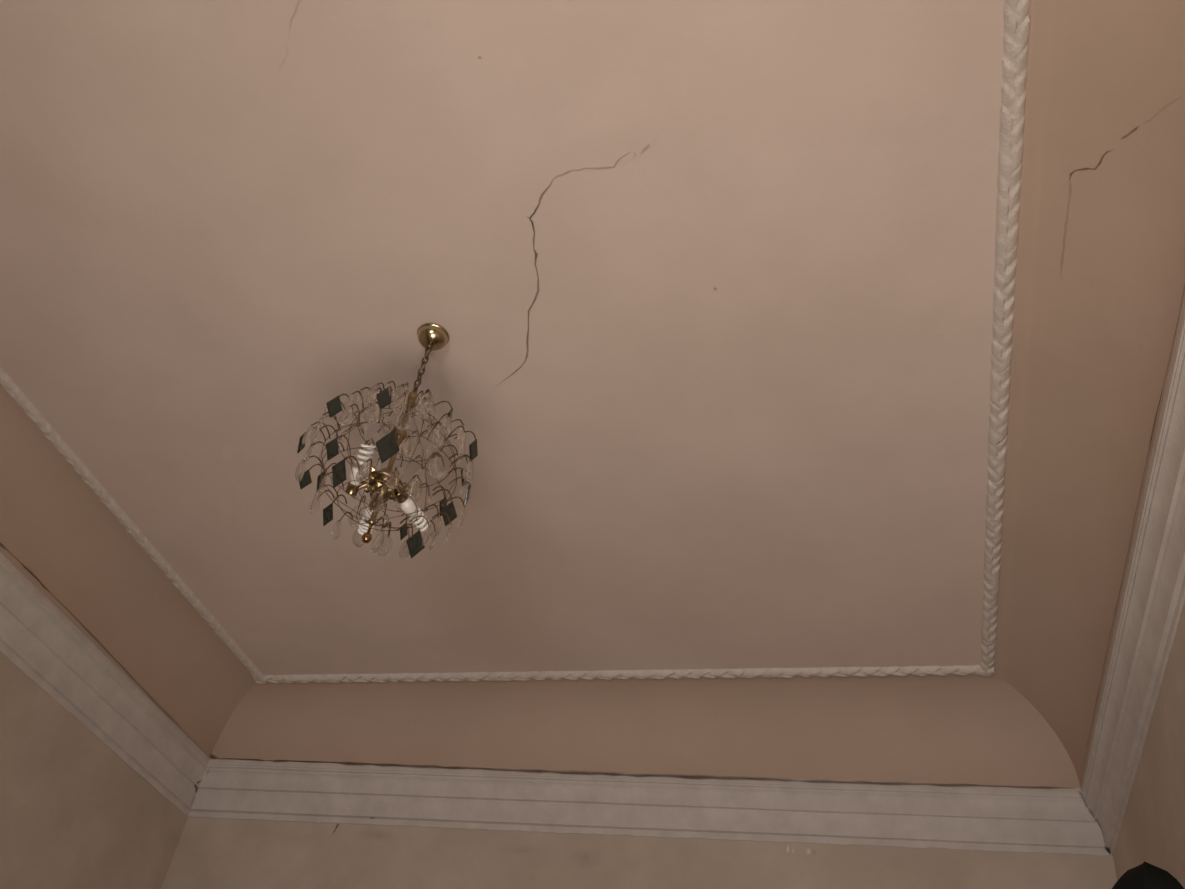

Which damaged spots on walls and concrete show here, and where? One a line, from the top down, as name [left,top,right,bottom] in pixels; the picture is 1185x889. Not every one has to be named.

crack [509,189,547,377]